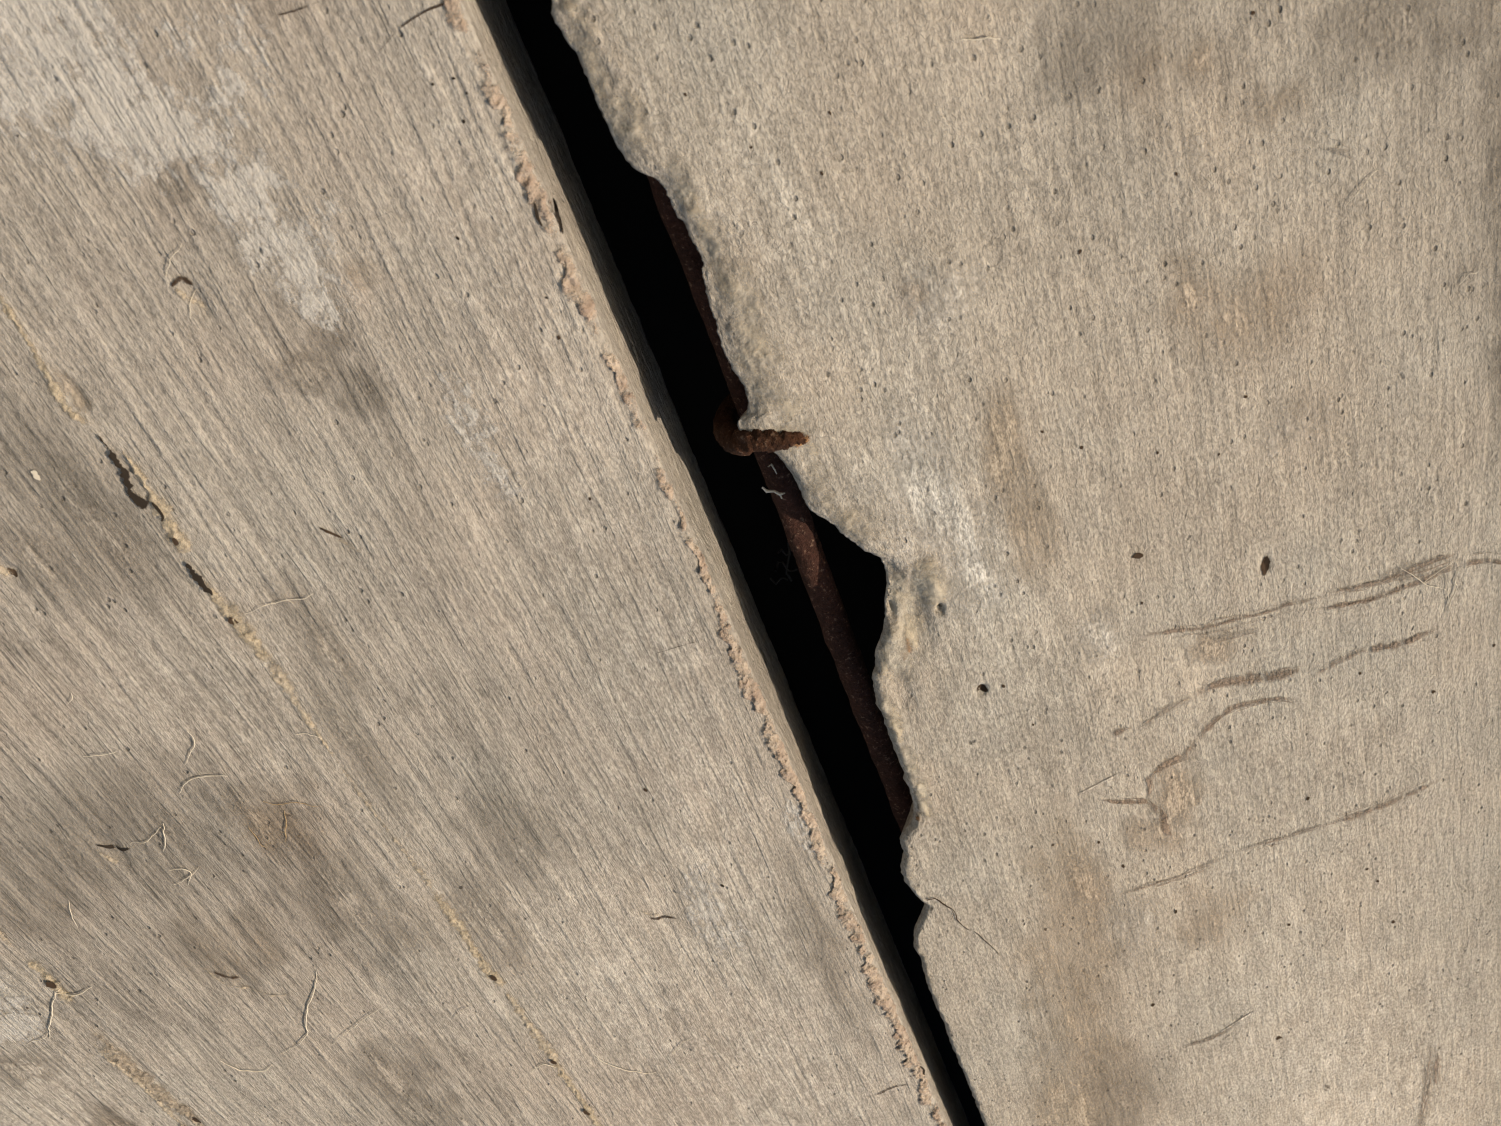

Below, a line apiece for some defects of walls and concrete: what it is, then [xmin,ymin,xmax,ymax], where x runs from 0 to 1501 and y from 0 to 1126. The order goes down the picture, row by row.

water stain [0,0,356,332]
spalling [475,55,598,334]
spalling [567,0,646,153]
spalling [602,354,646,429]
spalling [655,455,948,1126]
crack [927,898,1000,956]